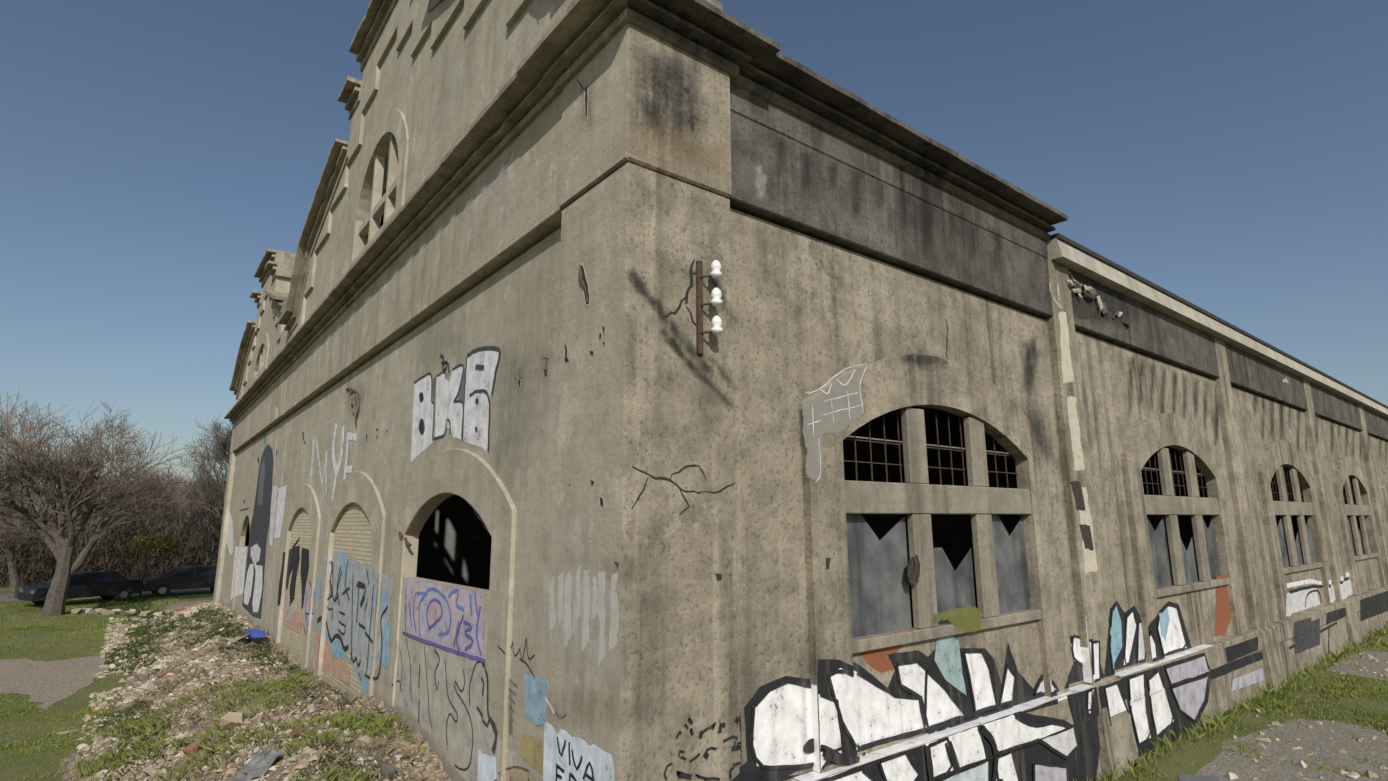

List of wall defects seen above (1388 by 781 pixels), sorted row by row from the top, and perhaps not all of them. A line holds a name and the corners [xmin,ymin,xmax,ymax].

crack [631,464,735,515]